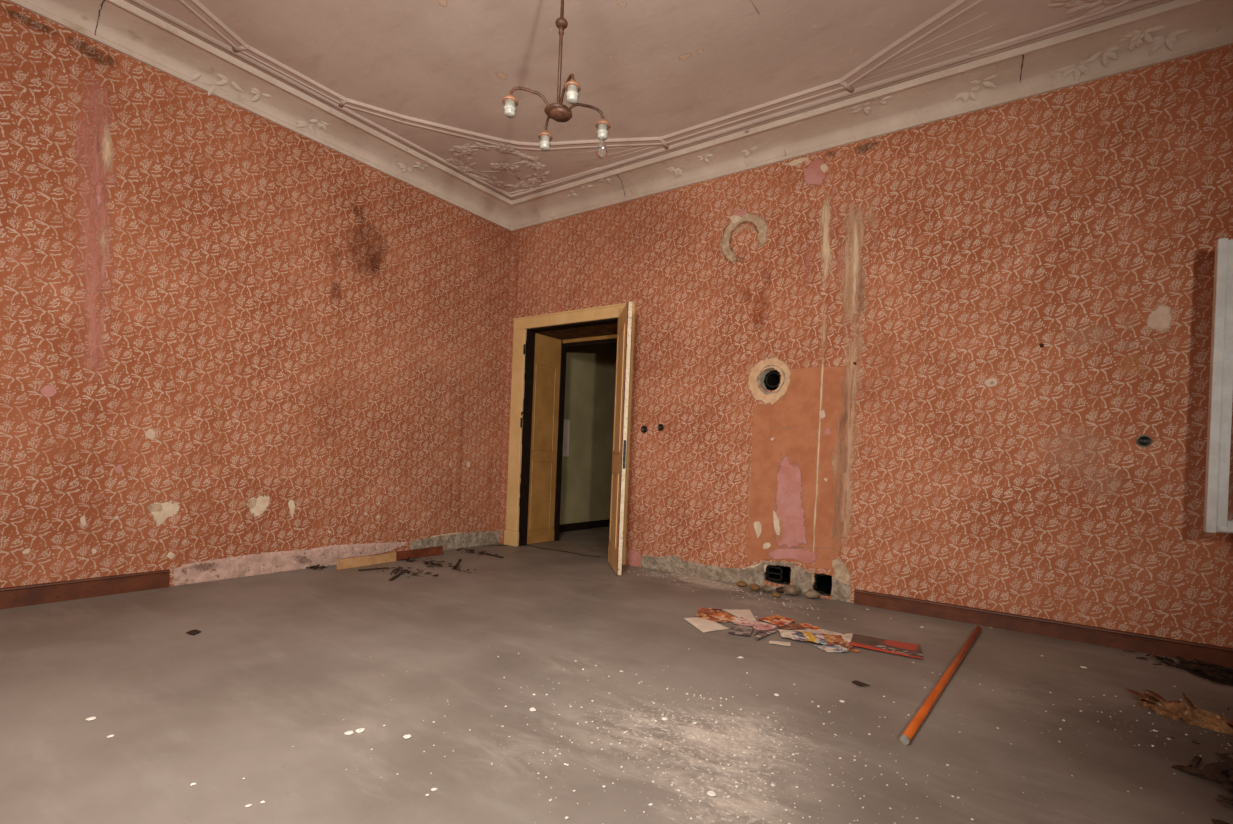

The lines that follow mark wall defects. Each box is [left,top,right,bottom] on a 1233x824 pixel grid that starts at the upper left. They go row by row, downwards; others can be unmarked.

peeling [1147,304,1172,332]
spalling [747,356,791,405]
peeling [147,501,180,526]
spalling [167,495,500,586]
peeling [626,455,817,595]
spalling [831,558,851,602]